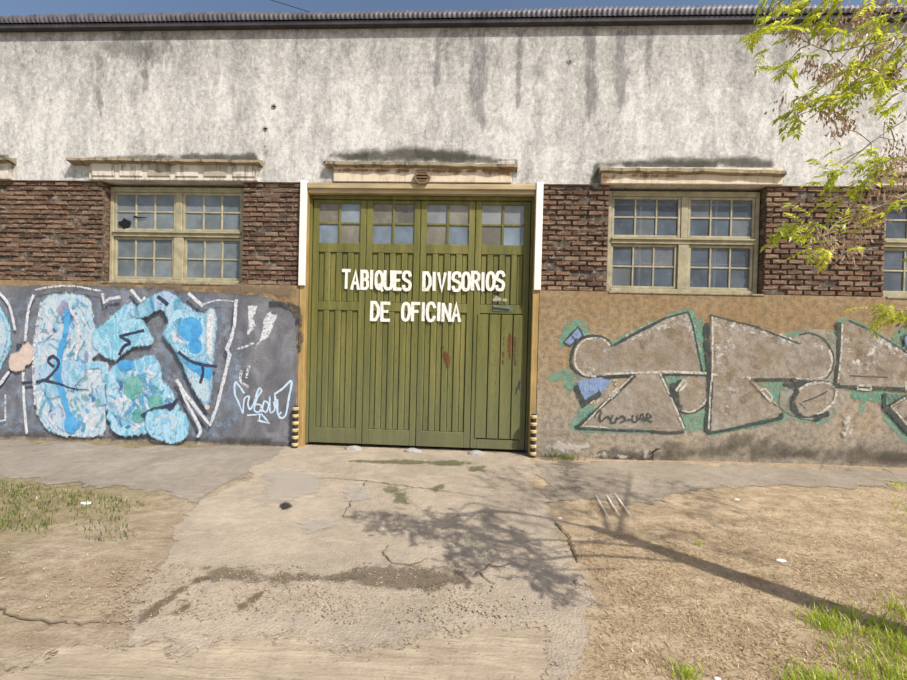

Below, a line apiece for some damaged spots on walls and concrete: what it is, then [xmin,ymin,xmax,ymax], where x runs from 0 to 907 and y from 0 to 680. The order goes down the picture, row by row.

crack [554,521,580,562]
crack [0,607,113,624]